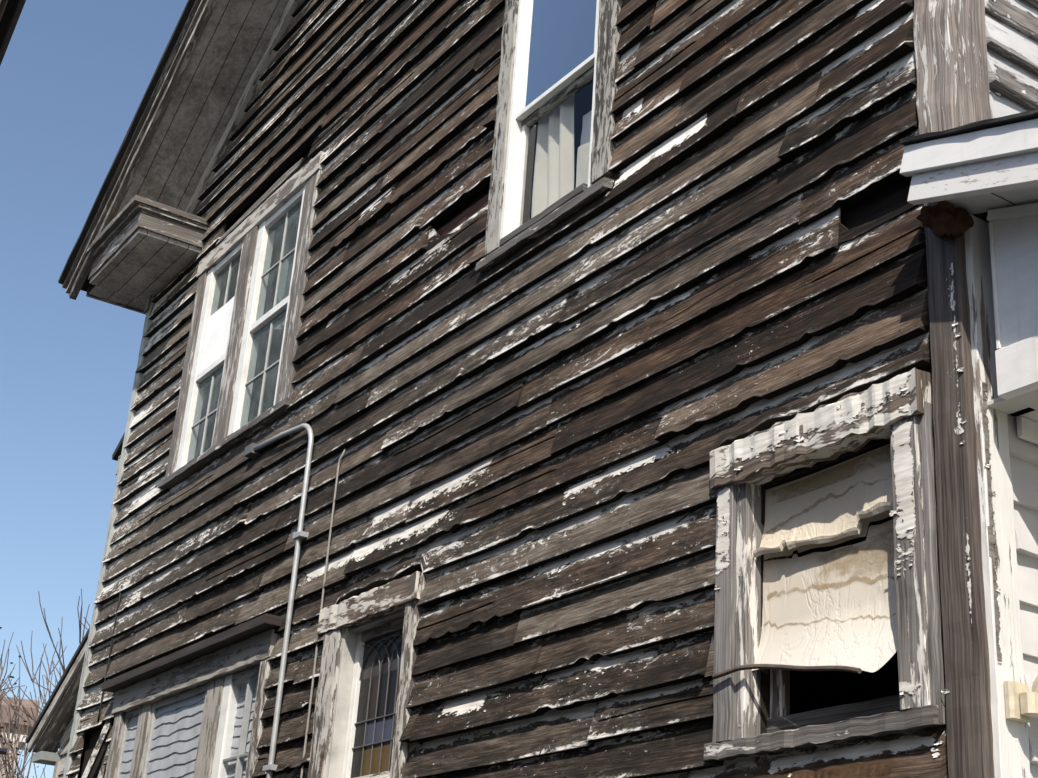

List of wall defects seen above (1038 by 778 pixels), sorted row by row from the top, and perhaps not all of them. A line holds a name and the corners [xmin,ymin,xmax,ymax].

peeling [989,64,1038,103]
peeling [619,97,644,127]
peeling [604,113,707,197]
peeling [562,447,681,505]
peeling [722,372,916,575]
peeling [298,456,496,586]
peeling [535,521,577,544]
peeling [533,541,632,578]
peeling [714,487,730,590]
peeling [520,571,631,616]
peeling [899,681,921,695]
peeling [767,736,943,777]